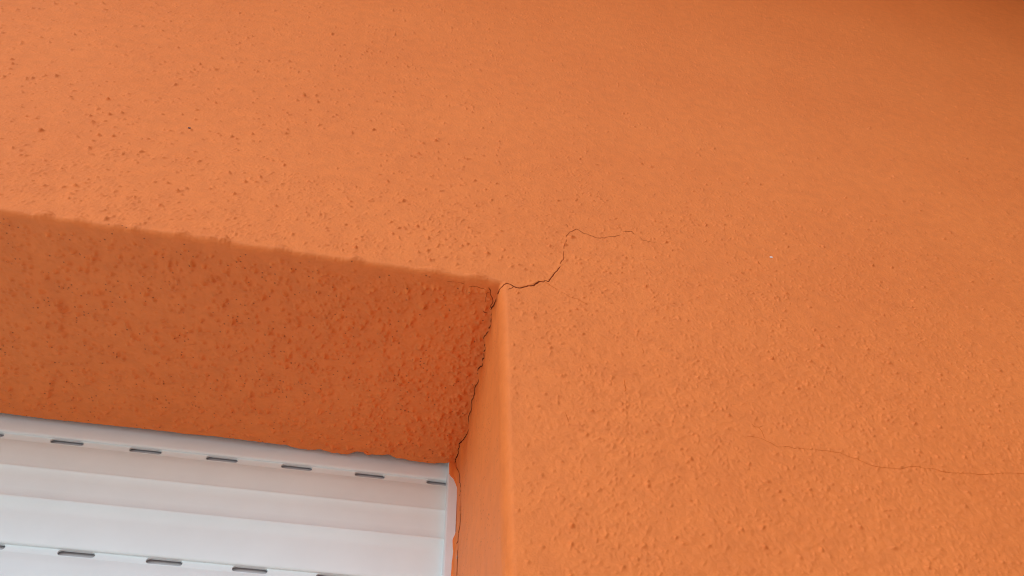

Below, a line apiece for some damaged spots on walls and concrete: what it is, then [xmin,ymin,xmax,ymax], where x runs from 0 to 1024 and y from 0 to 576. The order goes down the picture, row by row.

crack [448,224,645,492]